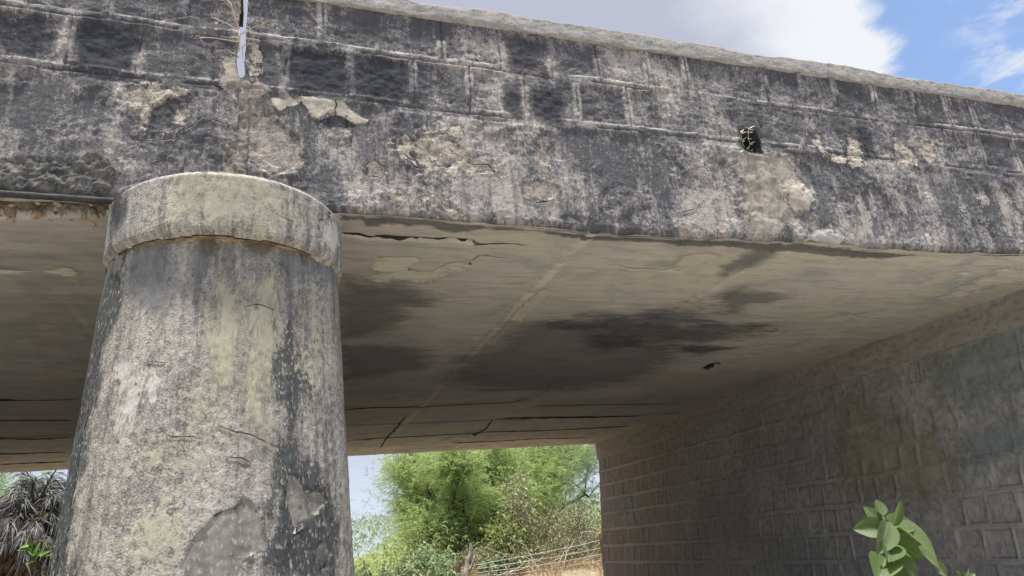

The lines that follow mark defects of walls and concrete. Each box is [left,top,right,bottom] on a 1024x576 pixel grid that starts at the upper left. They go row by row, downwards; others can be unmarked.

flaking render [121,40,368,177]
spalling [0,144,126,227]
crack [319,211,524,261]
damp [339,283,427,378]
damp [450,316,733,390]
damp [721,290,777,313]
crack [157,423,284,464]
crack [347,398,646,448]
flaking render [183,497,268,576]
flaking render [285,475,326,534]